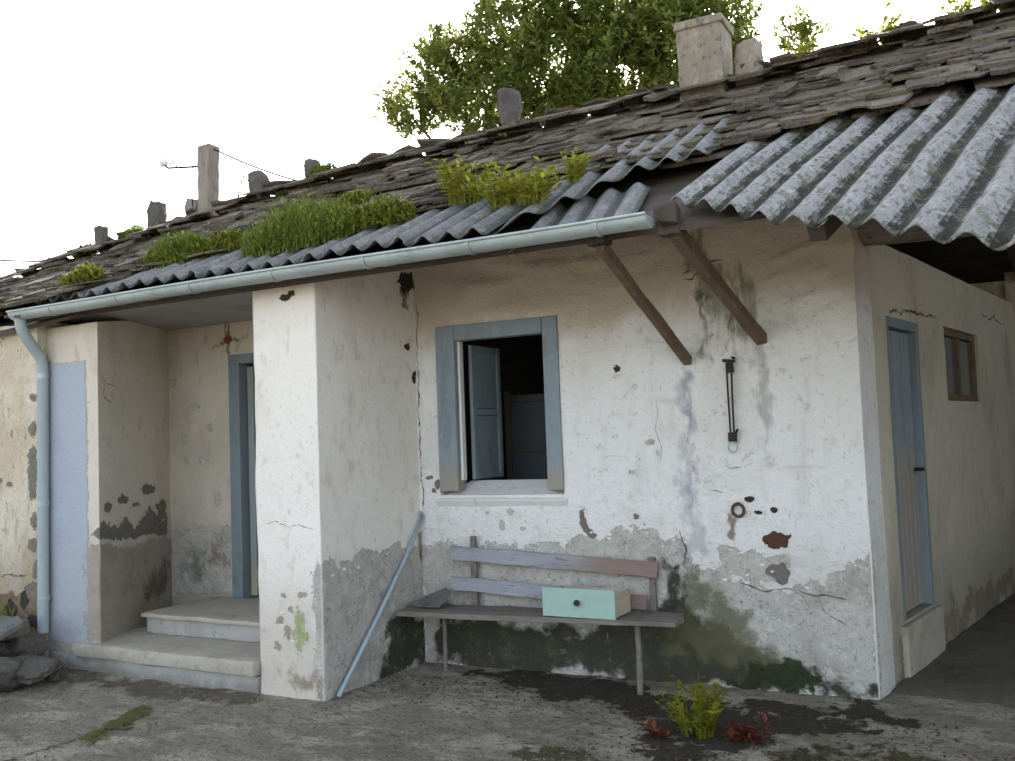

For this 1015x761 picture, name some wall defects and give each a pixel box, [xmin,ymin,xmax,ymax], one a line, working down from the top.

corrosion [216,327,247,355]
peeling [82,484,232,642]
peeling [274,510,883,701]
damp [380,560,787,691]
crack [741,583,846,625]
damp [802,666,879,698]